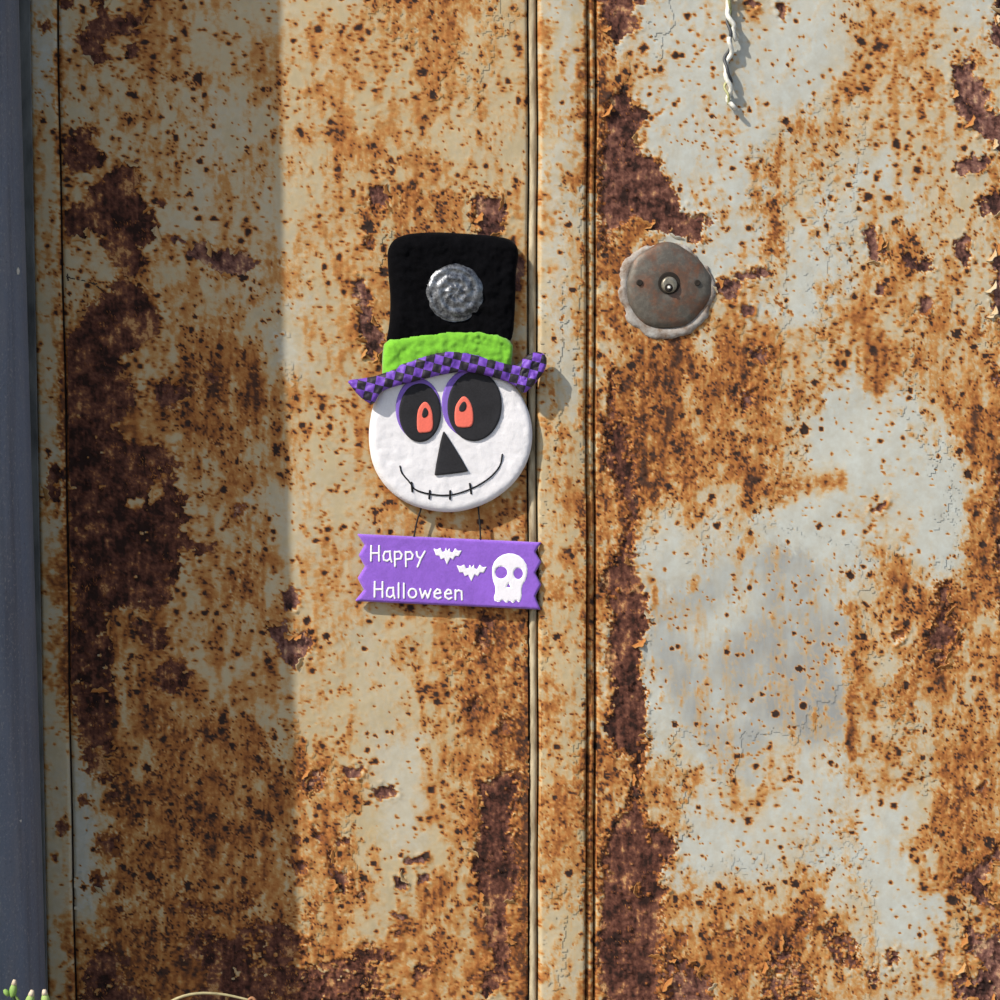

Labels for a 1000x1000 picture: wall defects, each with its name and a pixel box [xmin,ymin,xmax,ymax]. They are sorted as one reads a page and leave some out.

rust [362,0,519,110]
peeling [990,0,1000,48]
peeling [952,57,1000,176]
rust [353,179,481,272]
peeling [902,252,934,271]
peeling [953,233,971,267]
peeling [977,190,1000,218]
peeling [985,243,1000,324]
rust [160,280,301,548]
rust [439,9,880,1000]
rust [849,294,1000,937]
rust [74,692,372,994]